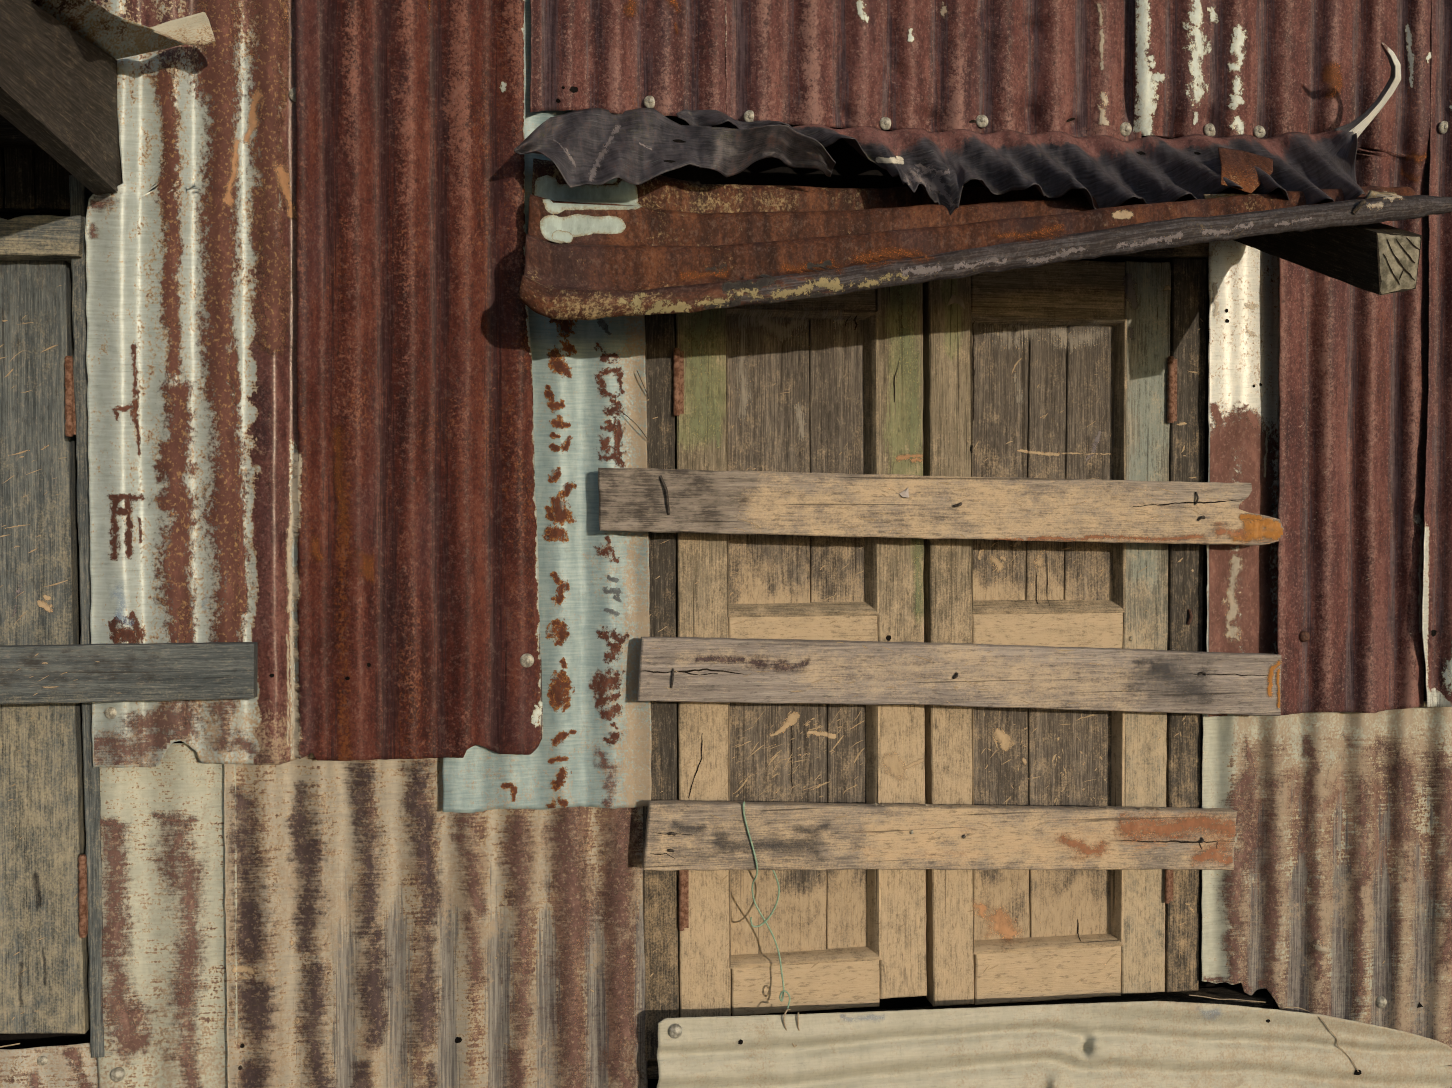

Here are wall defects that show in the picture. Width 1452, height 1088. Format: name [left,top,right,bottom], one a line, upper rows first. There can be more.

peeling [1133,0,1165,136]
peeling [1182,0,1248,134]
rust [107,0,294,644]
rust [542,319,626,543]
rust [1210,401,1279,517]
rust [1209,542,1278,654]
rust [100,813,207,1088]
rust [94,699,274,767]
rust [226,760,392,1088]
rust [401,760,488,1045]
rust [497,571,643,1088]
rust [1203,734,1325,1000]